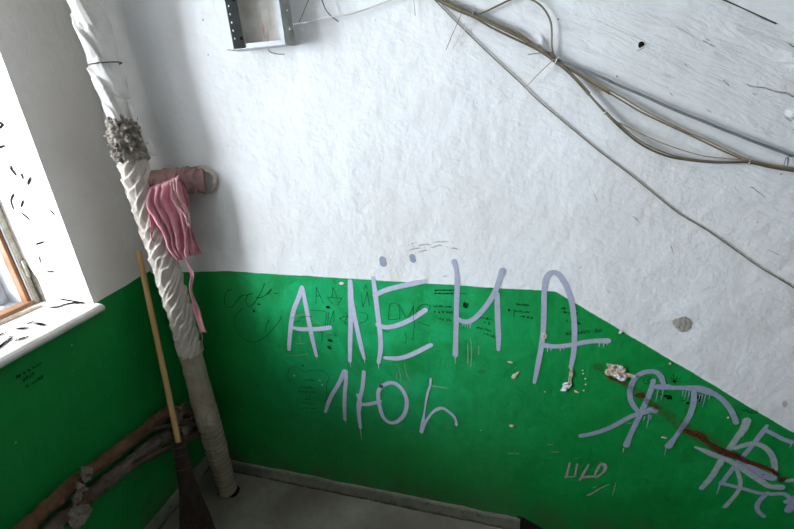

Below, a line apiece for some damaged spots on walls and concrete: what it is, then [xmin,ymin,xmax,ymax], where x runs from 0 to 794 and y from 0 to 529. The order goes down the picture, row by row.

rust [683,429,787,483]